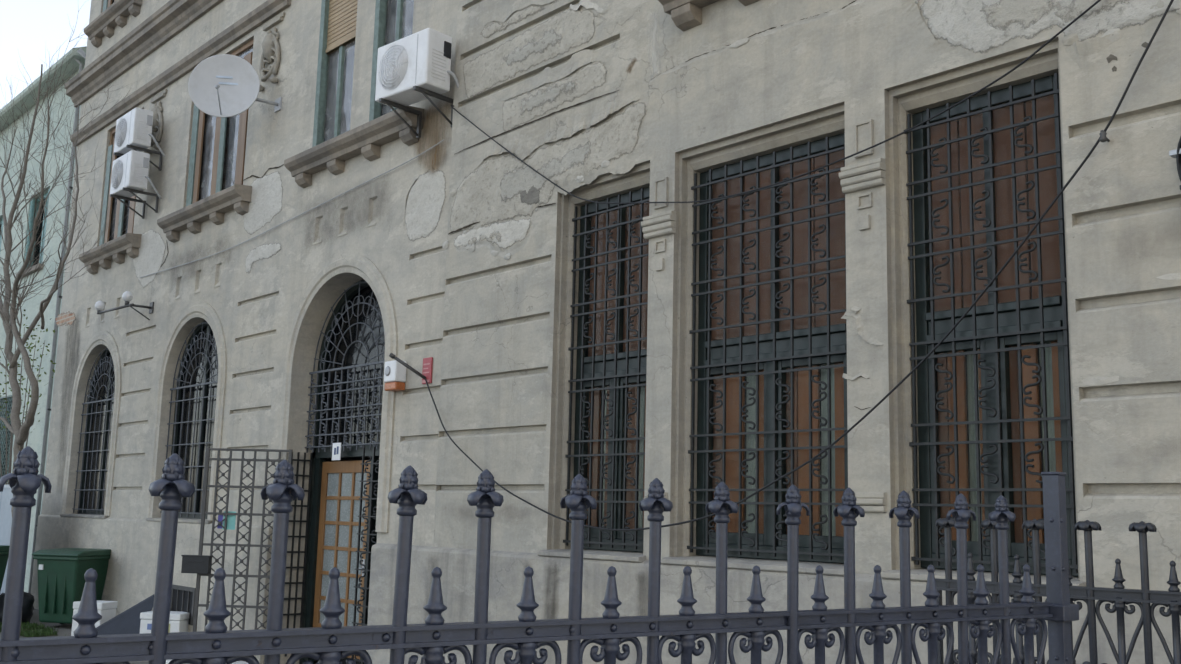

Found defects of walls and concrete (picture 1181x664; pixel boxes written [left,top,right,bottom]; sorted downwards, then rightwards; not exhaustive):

spalling [463,0,612,131]
crack [650,0,866,82]
spalling [889,0,1181,72]
spalling [244,171,283,234]
spalling [402,164,446,241]
spalling [133,229,165,287]
spalling [442,219,531,260]